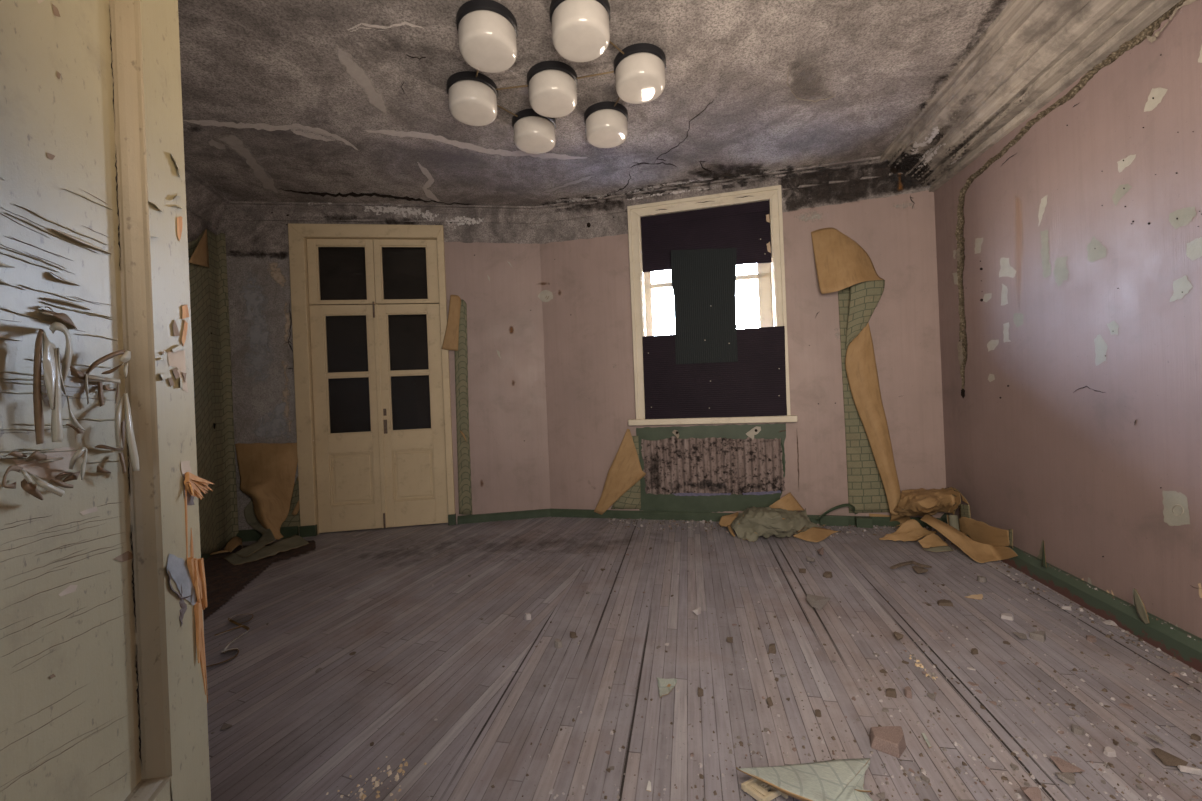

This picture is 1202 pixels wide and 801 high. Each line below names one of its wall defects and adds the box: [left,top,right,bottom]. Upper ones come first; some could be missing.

crack [183,21,713,205]
peeling [1144,87,1168,112]
peeling [149,195,183,241]
mould [542,146,935,211]
crack [955,0,1197,398]
peeling [975,238,1016,306]
peeling [160,305,189,392]
peeling [2,297,140,500]
mould [636,423,786,512]
peeling [167,554,196,605]